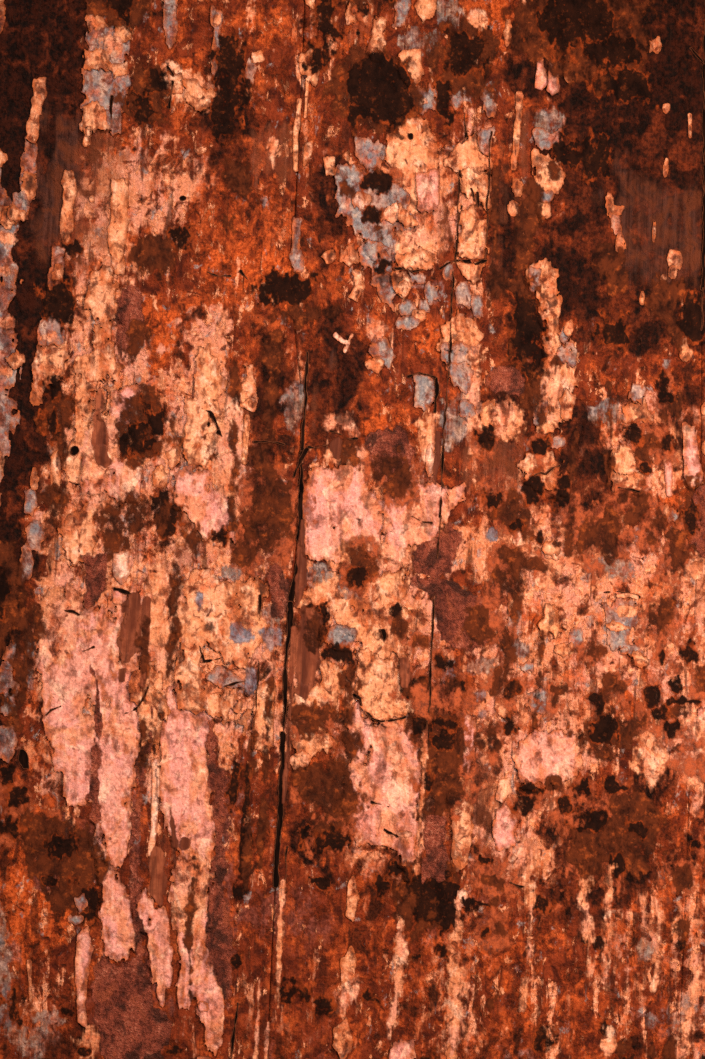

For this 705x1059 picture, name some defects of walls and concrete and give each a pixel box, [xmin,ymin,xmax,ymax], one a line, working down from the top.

rust [302,0,659,140]
peeling [507,57,572,223]
rust [114,384,185,470]
rust [89,486,229,562]
crack [199,646,220,663]
peeling [0,0,534,1059]
crack [224,351,359,888]
rust [375,177,705,825]
peeling [517,258,580,494]
peeling [492,727,583,956]
rust [371,773,705,963]
peeling [577,864,615,991]